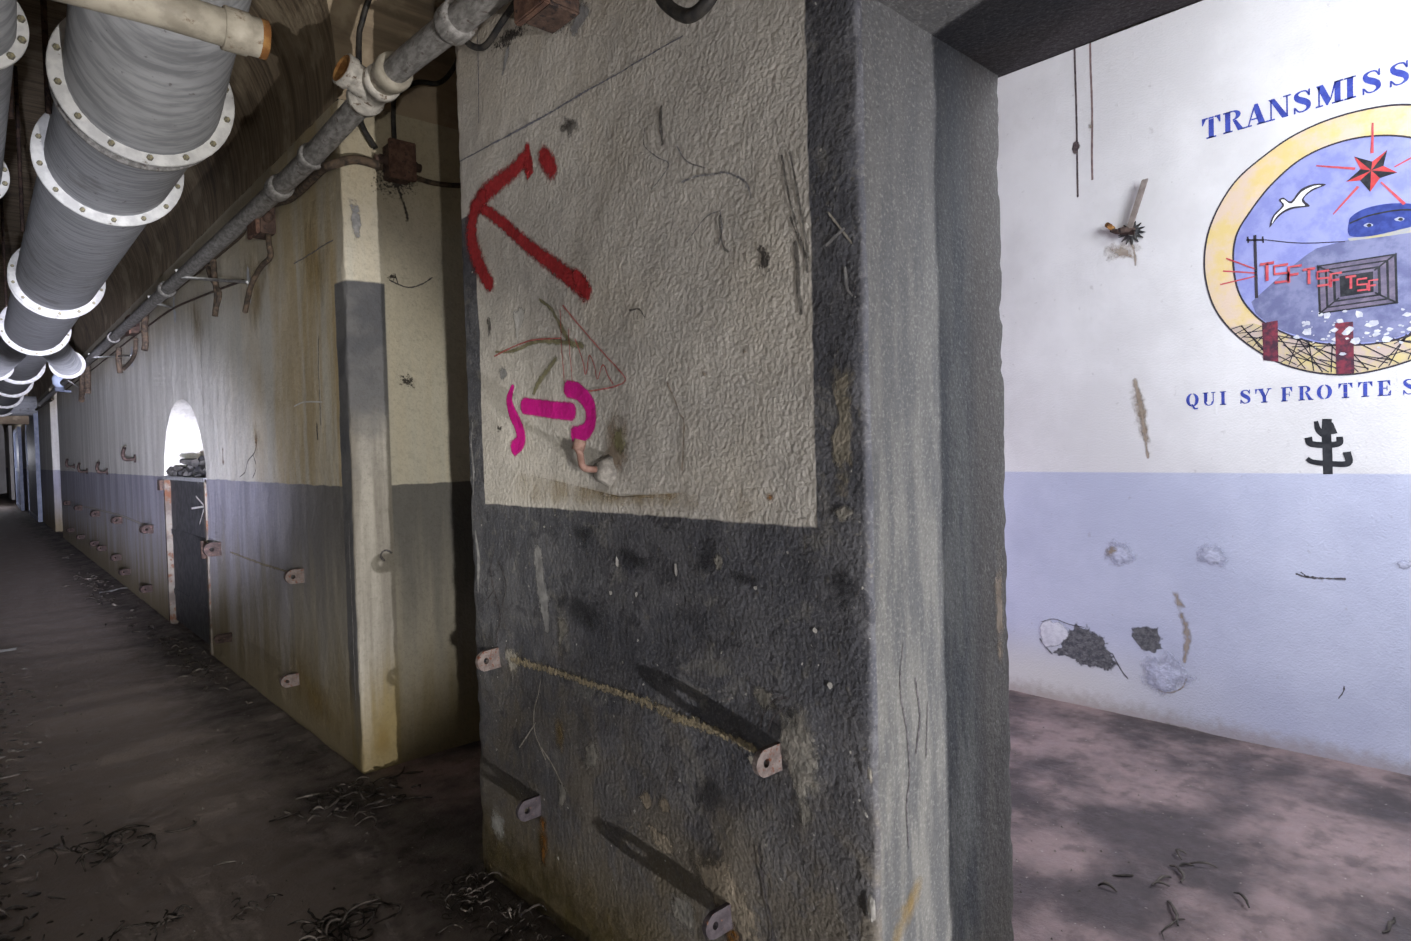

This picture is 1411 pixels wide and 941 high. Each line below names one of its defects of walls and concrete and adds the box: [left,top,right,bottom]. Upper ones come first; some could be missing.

spalling [1040,619,1128,679]
spalling [1131,626,1161,653]